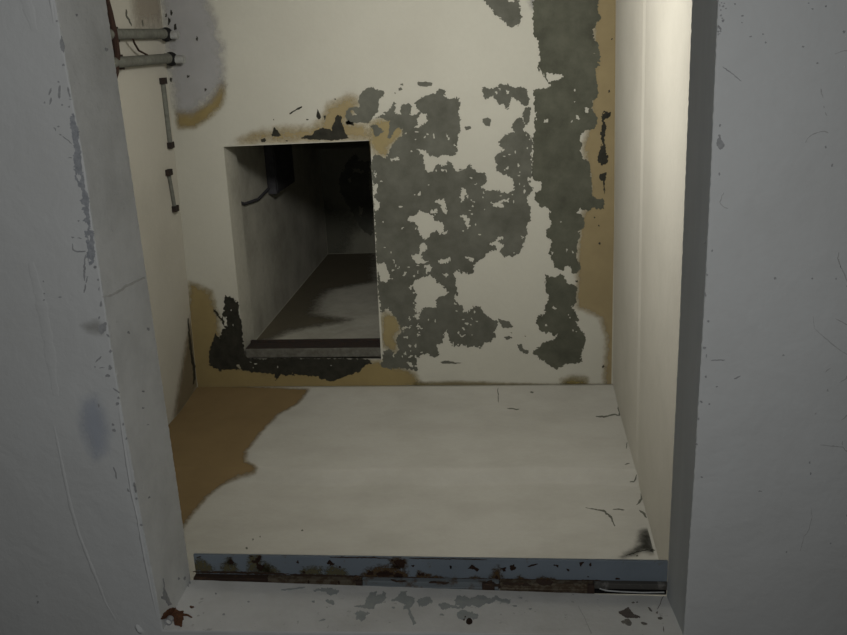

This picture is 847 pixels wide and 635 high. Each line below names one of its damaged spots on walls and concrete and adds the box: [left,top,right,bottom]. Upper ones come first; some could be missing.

leakage [176,83,224,128]
peeling [44,81,100,293]
peeling [339,0,611,371]
rust [193,555,601,594]
peeling [354,591,522,625]